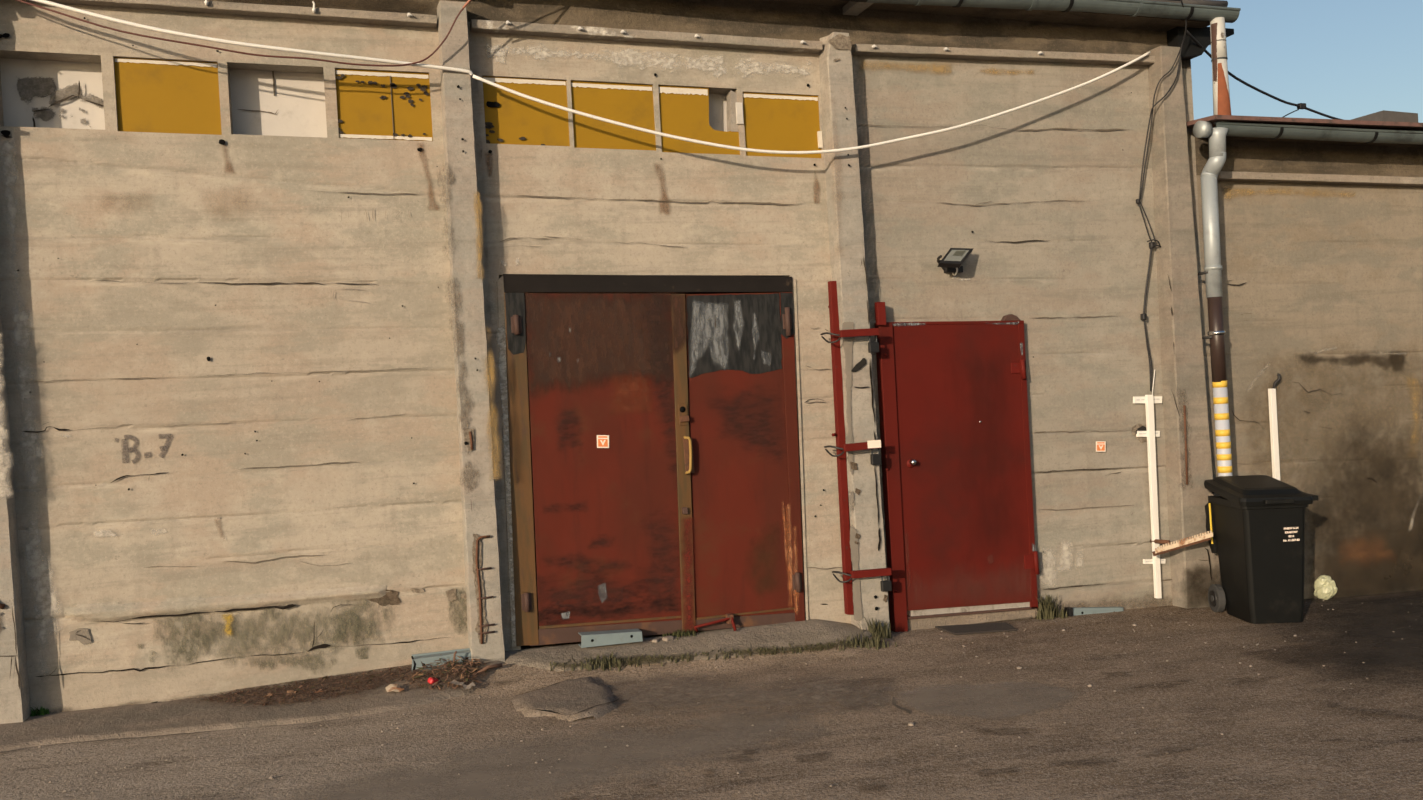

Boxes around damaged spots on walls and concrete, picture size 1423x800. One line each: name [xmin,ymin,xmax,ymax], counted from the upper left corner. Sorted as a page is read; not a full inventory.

spalling [17,77,104,127]
corrosion [657,158,669,213]
damp [1253,366,1423,543]
spalling [367,588,425,606]